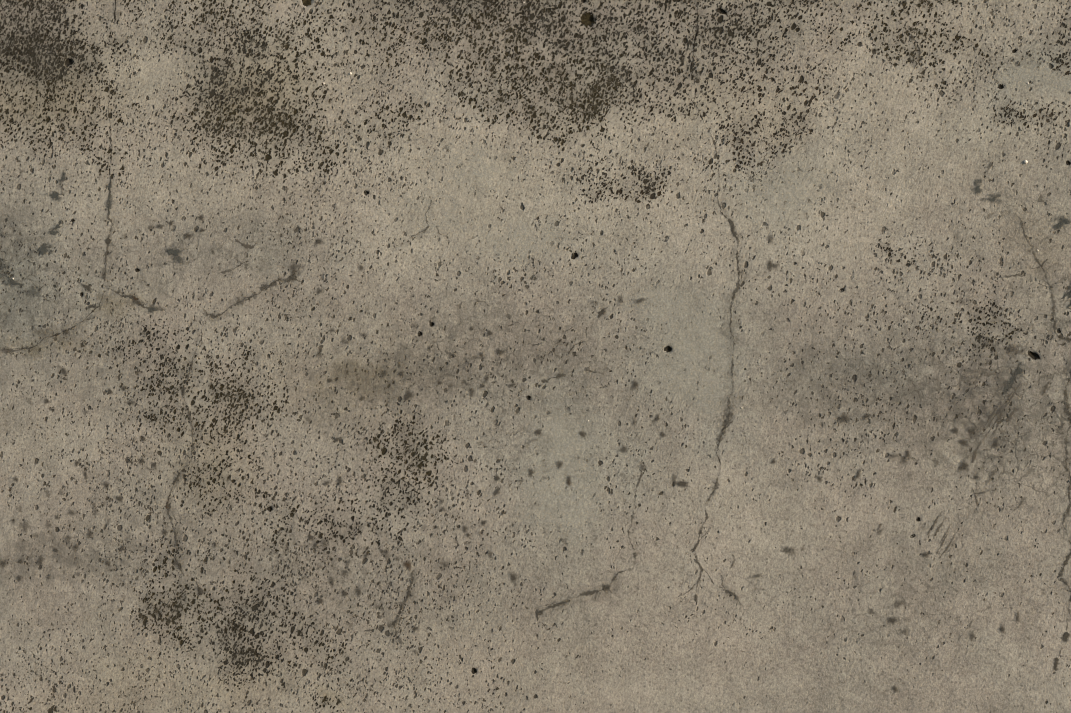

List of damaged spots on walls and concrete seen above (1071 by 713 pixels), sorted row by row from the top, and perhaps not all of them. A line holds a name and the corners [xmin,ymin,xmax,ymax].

crack [691,3,740,337]
crack [1006,223,1071,341]
crack [688,364,737,602]
crack [1054,377,1071,670]